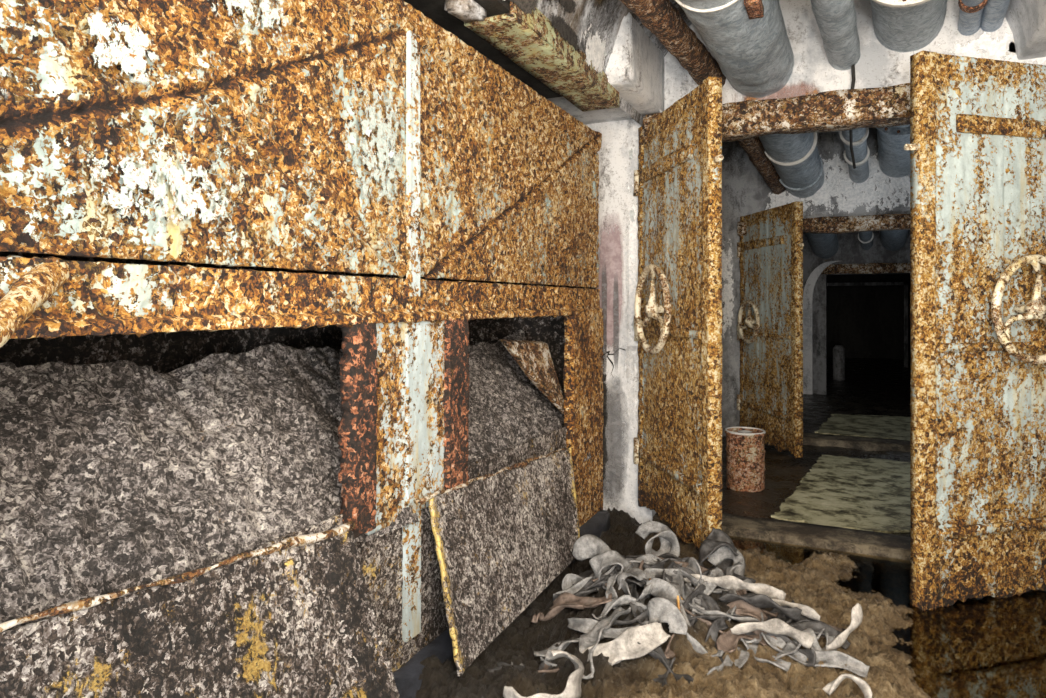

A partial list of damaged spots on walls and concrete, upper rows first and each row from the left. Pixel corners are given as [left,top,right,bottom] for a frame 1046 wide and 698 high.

corrosion [747,83,819,100]